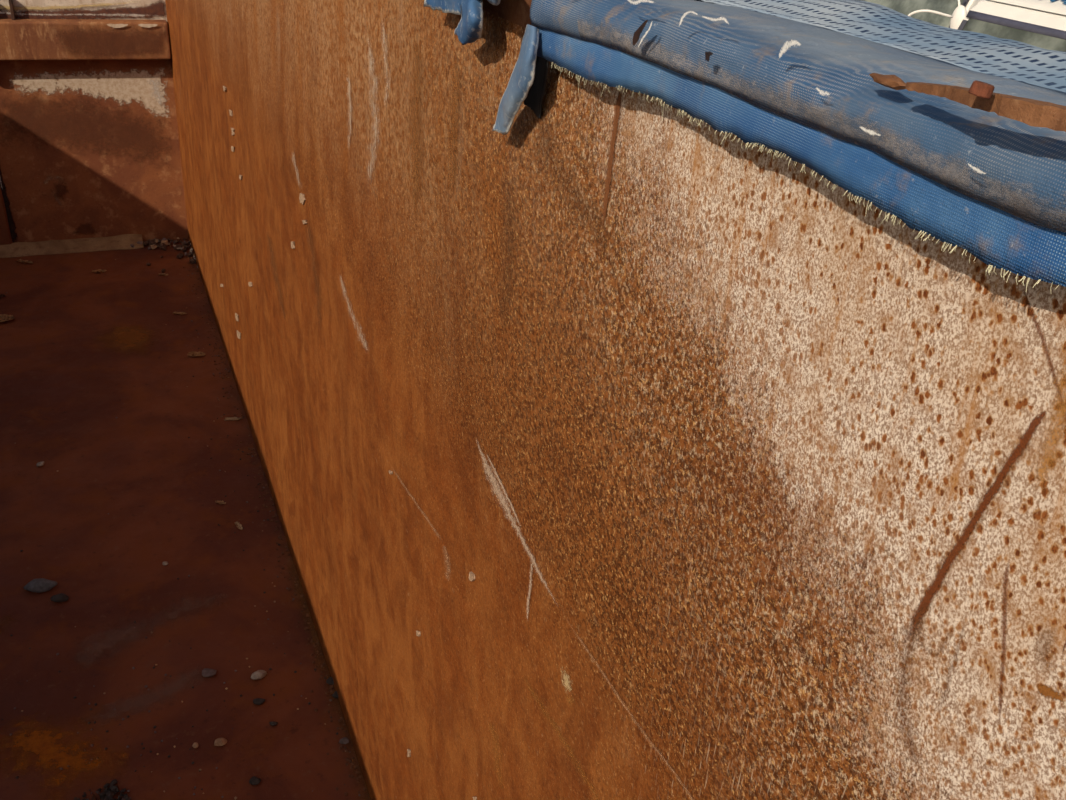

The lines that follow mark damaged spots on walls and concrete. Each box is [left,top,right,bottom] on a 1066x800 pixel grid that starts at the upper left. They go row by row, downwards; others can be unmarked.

corrosion [0,0,165,56]
peeling [9,68,169,117]
corrosion [603,89,622,222]
corrosion [1037,685,1063,701]